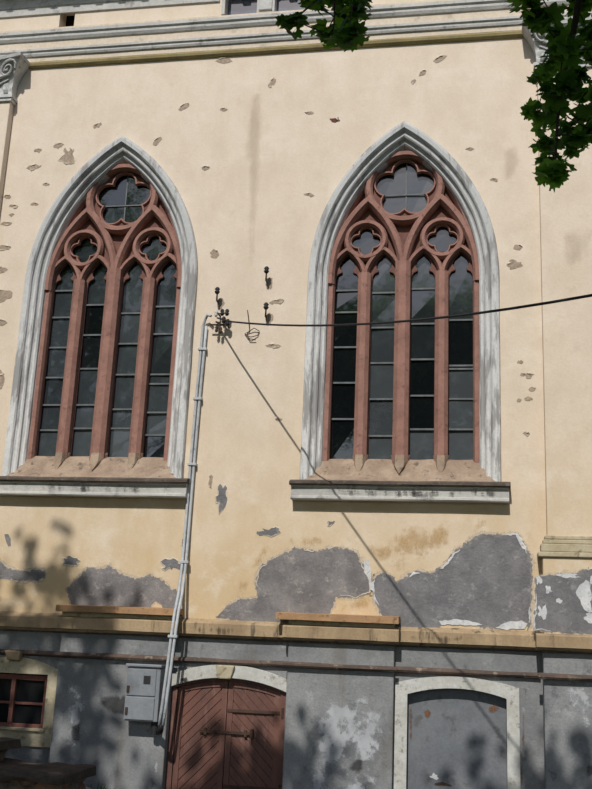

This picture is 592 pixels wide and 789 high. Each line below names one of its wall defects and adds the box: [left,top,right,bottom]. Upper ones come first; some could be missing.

peeling [53,142,76,165]
peeling [226,531,592,635]